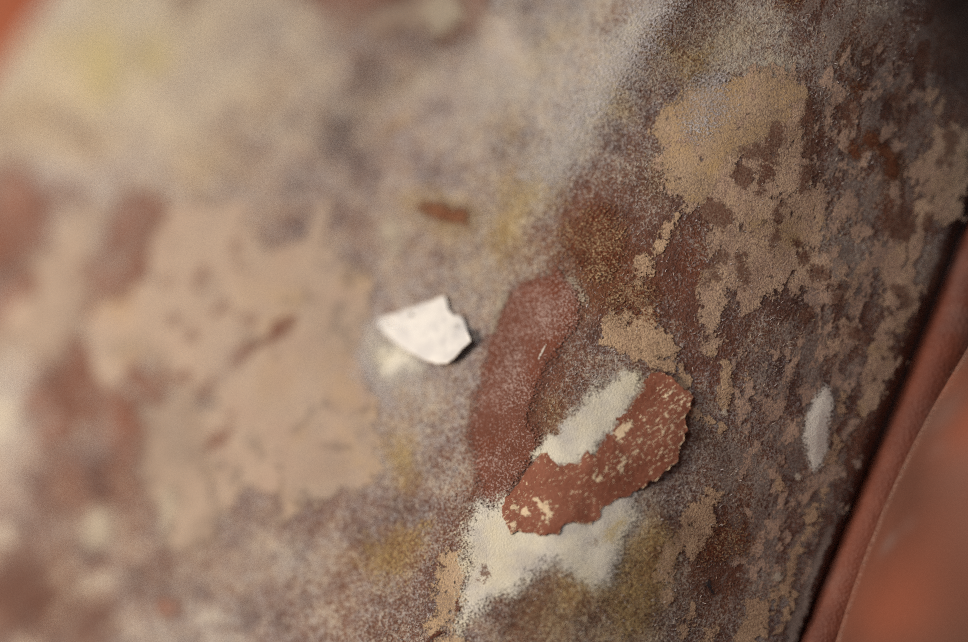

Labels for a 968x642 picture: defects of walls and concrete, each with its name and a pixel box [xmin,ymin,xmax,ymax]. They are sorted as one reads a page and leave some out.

peeling [0,191,471,530]
peeling [422,37,968,642]